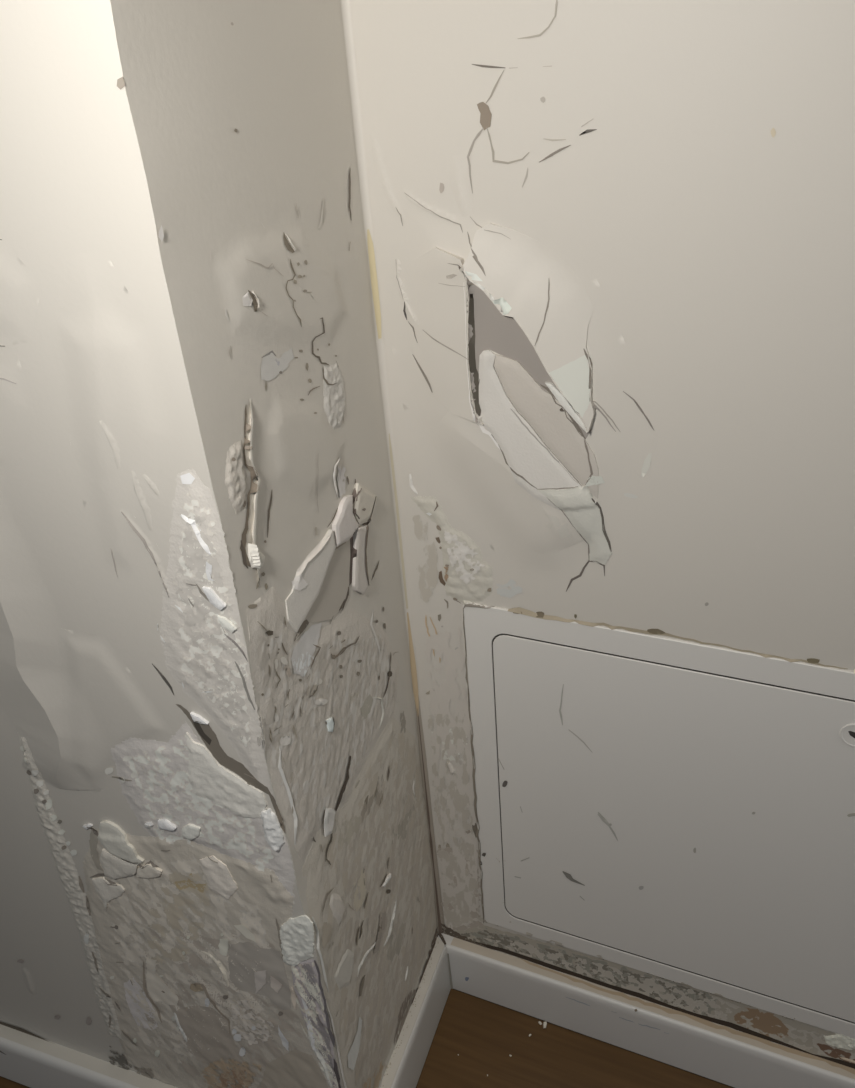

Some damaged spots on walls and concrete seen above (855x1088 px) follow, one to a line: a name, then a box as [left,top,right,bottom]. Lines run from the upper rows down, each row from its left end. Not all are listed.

peeling [225,440,253,515]
crack [240,407,272,589]
crack [246,259,339,395]
peeling [295,343,346,430]
peeling [409,474,493,605]
peeling [396,223,612,565]
crack [396,64,620,591]
crack [152,476,379,833]
spalling [19,454,399,1088]
crack [313,756,389,943]
crack [444,599,855,1069]
peeling [823,1033,855,1050]